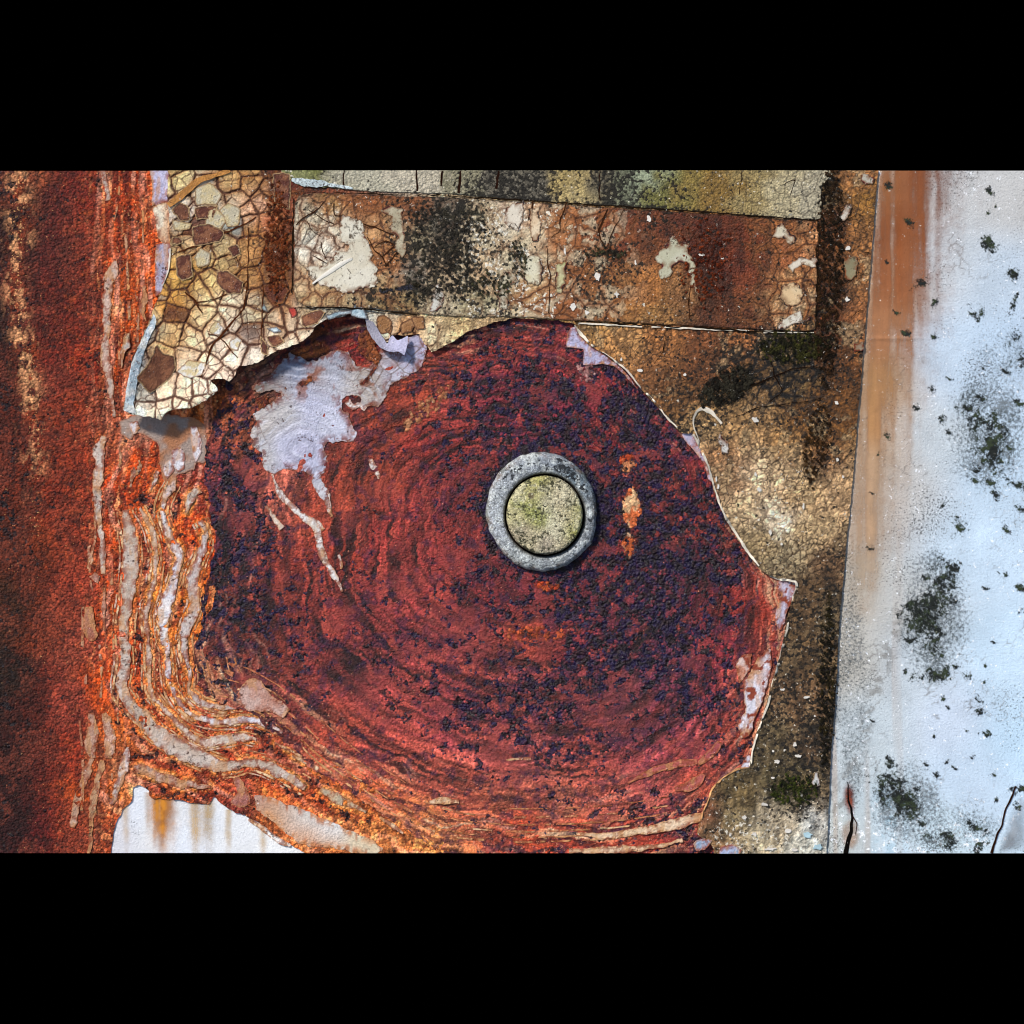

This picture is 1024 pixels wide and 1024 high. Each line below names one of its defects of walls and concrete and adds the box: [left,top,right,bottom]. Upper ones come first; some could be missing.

rust [0,171,792,853]
water stain [379,205,531,304]
peeling [70,170,879,854]
water stain [695,170,846,490]
crack [843,782,857,853]
water stain [767,591,993,853]
rust [856,171,941,584]
water stain [896,550,986,716]
water stain [938,328,1024,501]
crack [990,786,1021,853]